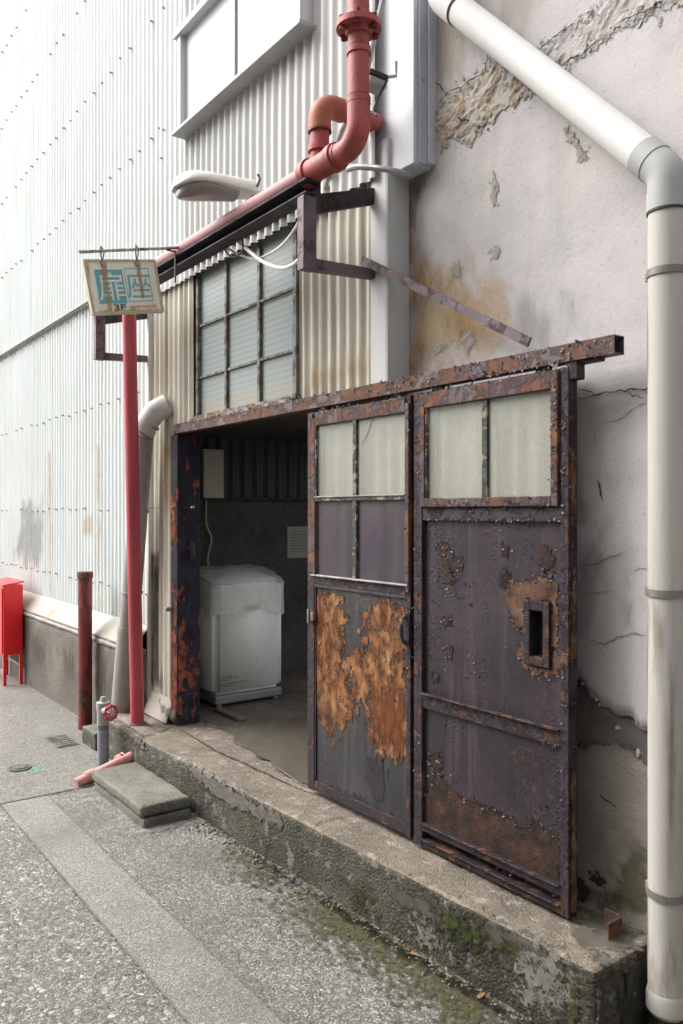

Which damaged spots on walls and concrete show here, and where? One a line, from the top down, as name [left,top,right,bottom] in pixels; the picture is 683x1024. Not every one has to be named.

spalling [536,0,683,71]
spalling [435,56,535,154]
peeling [489,170,499,206]
peeling [563,124,591,164]
crack [578,388,648,443]
rust [170,582,200,723]
rust [316,588,406,766]
peeling [176,328,648,903]
rust [498,541,578,678]
crack [580,552,645,572]
crack [580,630,648,657]
damp [314,875,644,1024]